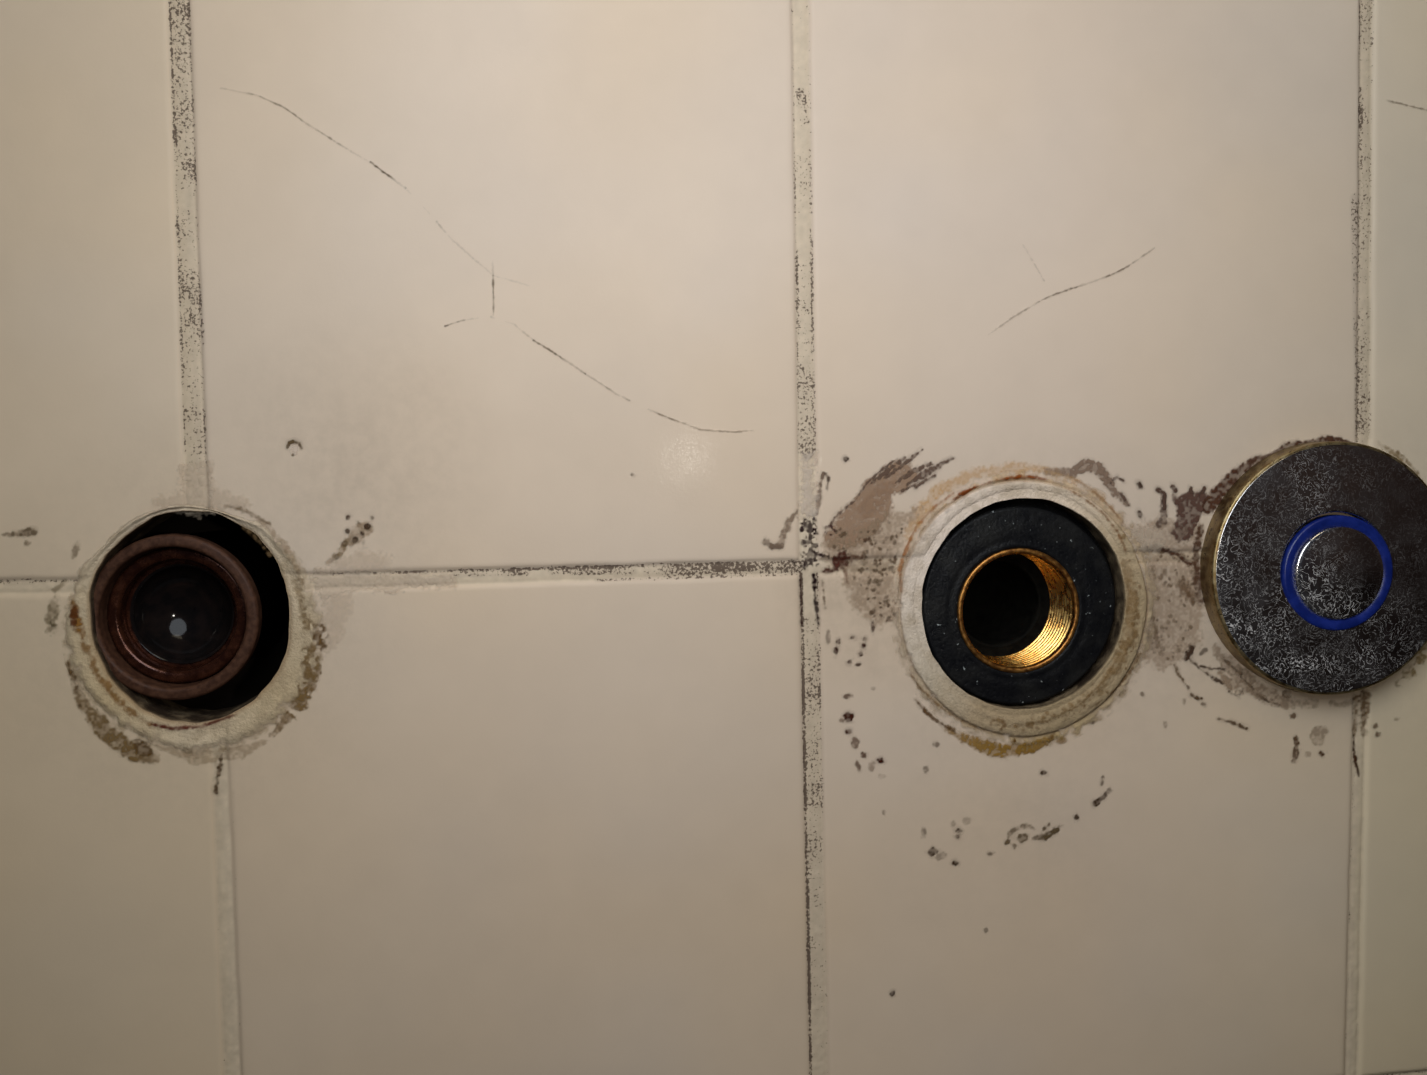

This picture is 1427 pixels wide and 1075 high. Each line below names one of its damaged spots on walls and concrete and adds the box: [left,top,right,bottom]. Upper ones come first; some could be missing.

damp [792,449,954,627]
damp [1145,526,1204,602]
corrosion [69,601,136,715]
corrosion [67,662,153,762]
corrosion [153,716,231,730]
corrosion [277,615,327,731]
damp [843,694,884,769]
damp [1185,645,1269,702]
damp [1353,690,1378,776]
damp [1005,824,1059,845]